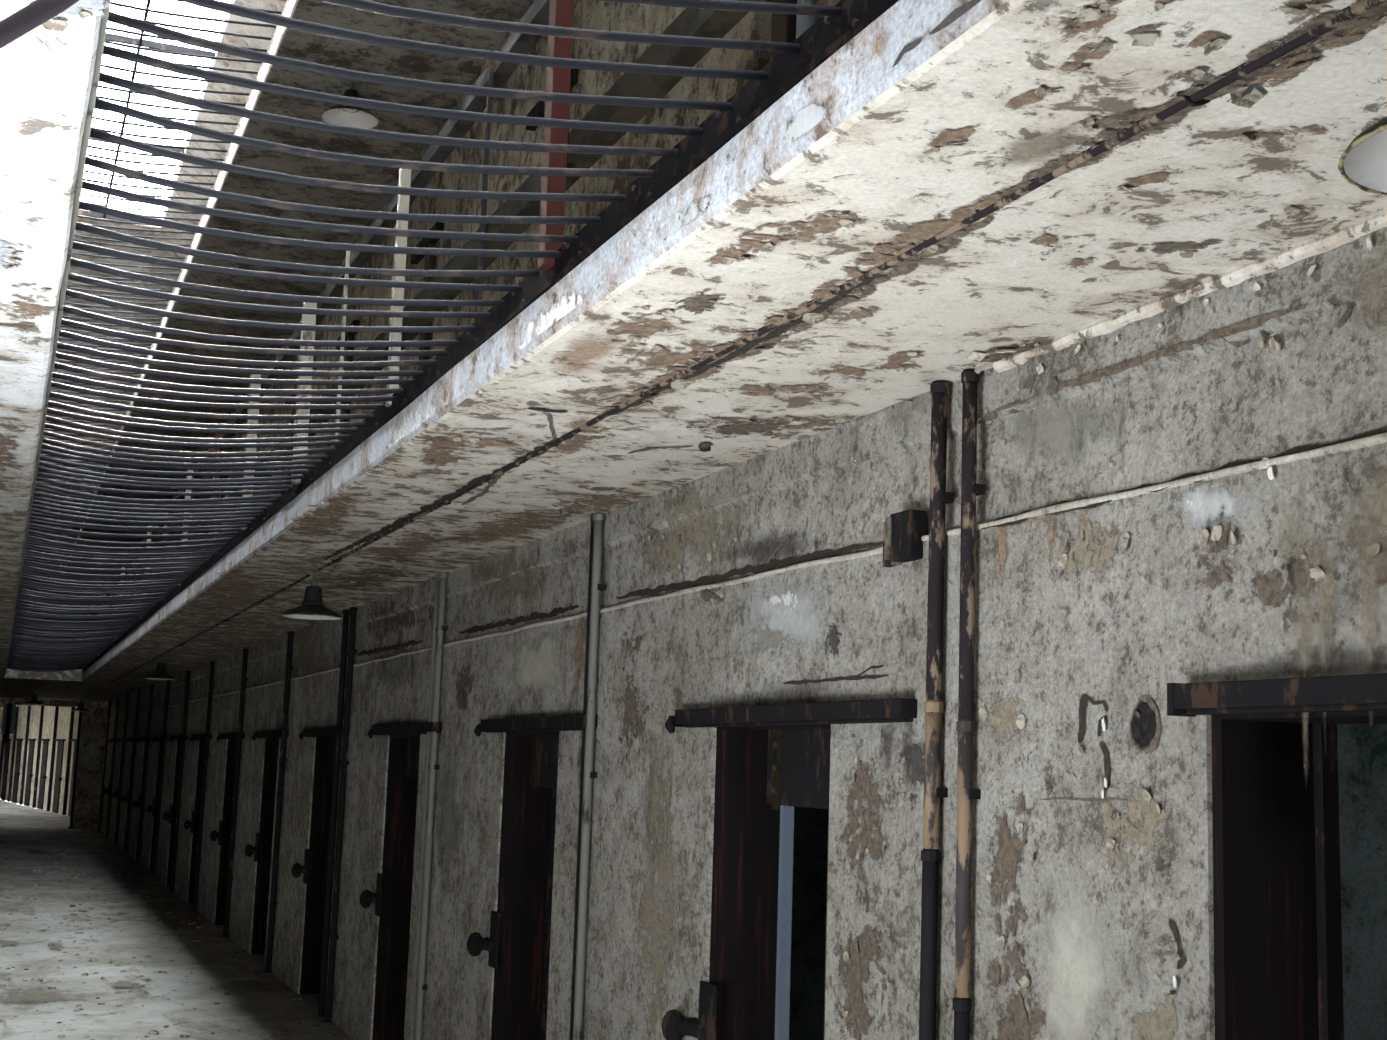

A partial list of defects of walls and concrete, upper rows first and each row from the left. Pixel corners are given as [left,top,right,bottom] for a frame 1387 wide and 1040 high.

peeling [42,0,110,31]
crack [892,0,981,68]
spalling [547,0,1387,456]
peeling [0,240,55,333]
peeling [519,289,584,349]
crack [977,305,1305,424]
peeling [386,400,516,470]
crack [981,427,1387,529]
crack [617,542,882,602]
leakage [1282,509,1334,677]
leakage [882,733,911,773]
crack [1078,694,1110,798]